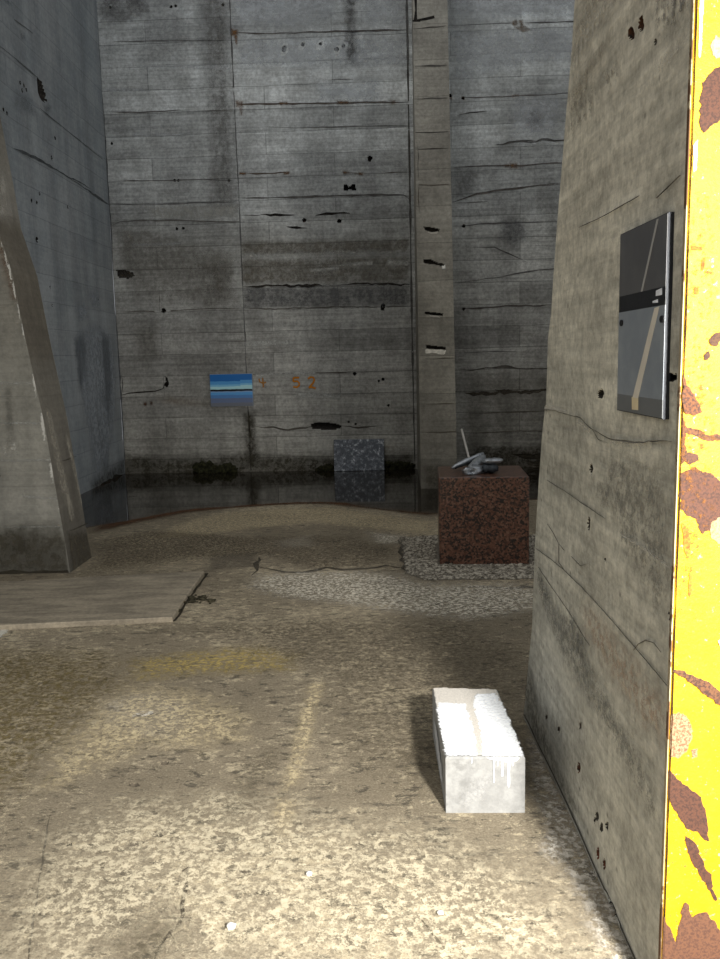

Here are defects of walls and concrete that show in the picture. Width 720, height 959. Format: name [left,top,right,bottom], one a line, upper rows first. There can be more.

water stain [77,327,334,487]
crack [436,0,698,946]
corrosion [658,0,714,959]